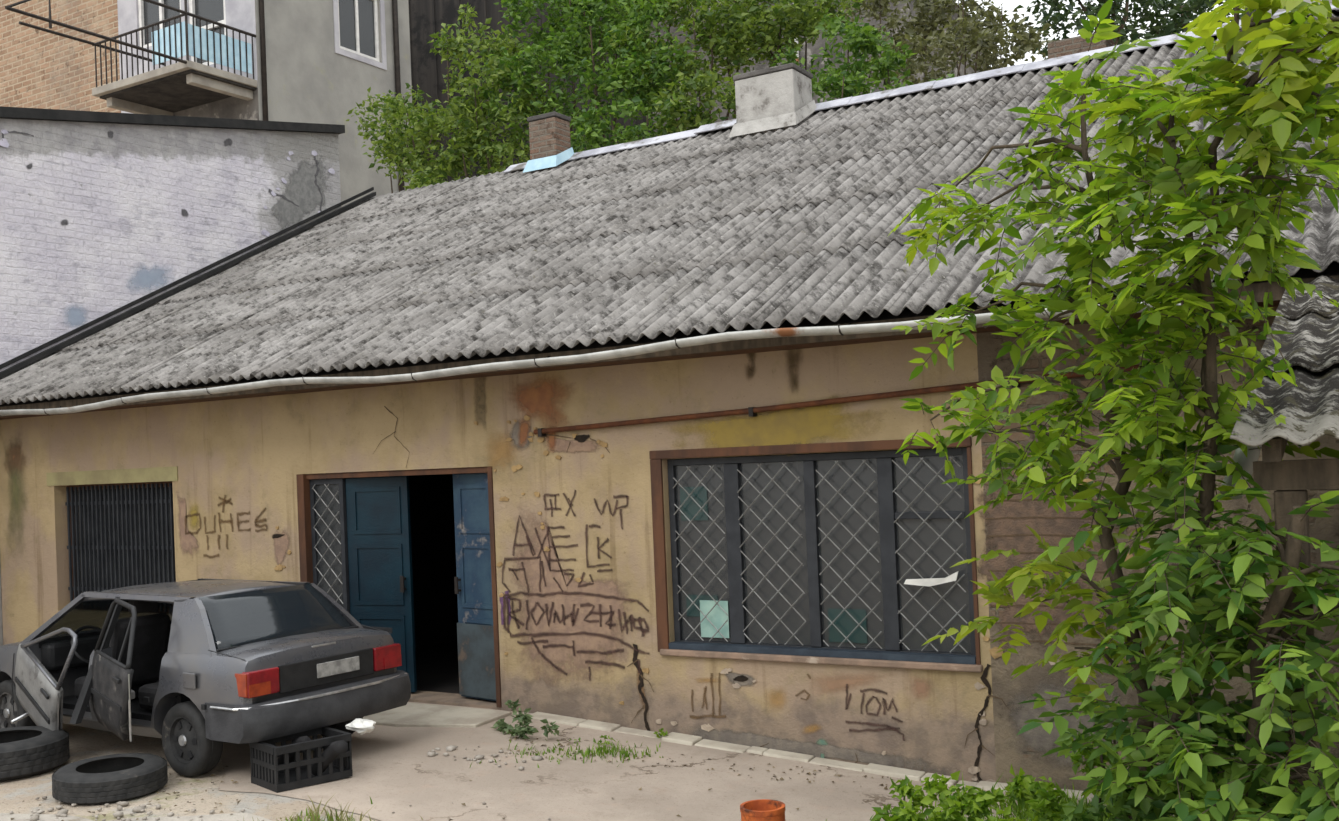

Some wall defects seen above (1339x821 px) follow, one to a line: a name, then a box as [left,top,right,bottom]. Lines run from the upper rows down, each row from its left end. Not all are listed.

spalling [0,129,33,148]
peeling [261,150,335,237]
corrosion [516,379,564,449]
crack [627,644,654,731]
crack [964,664,1010,783]